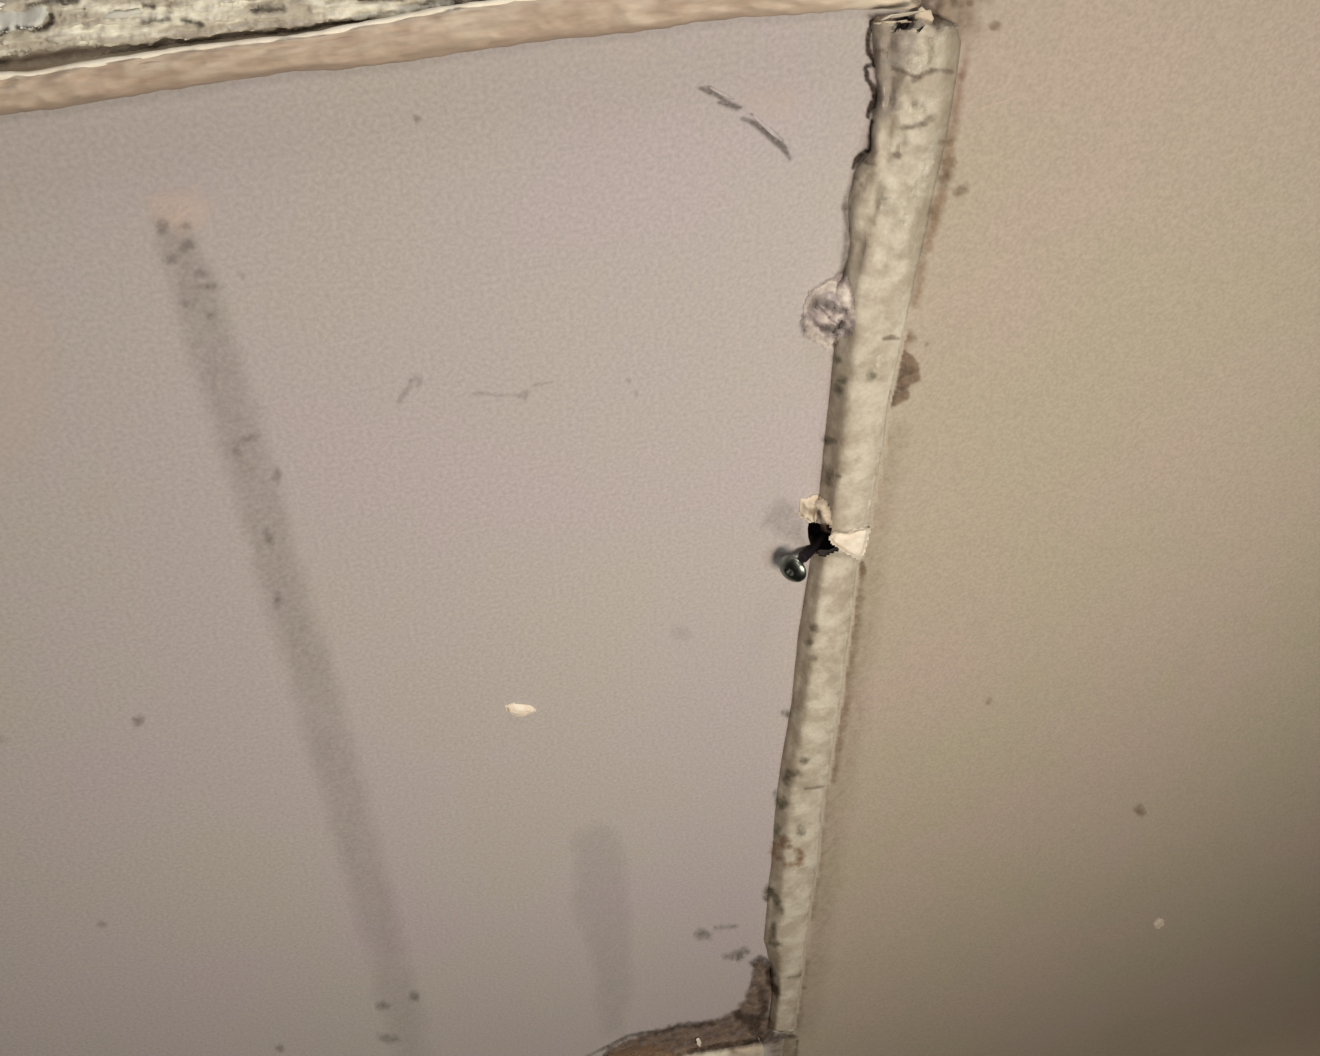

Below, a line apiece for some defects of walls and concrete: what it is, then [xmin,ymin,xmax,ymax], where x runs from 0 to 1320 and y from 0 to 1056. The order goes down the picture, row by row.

peeling [0,0,485,61]
spalling [873,6,951,75]
leakage [914,0,963,26]
crack [853,18,928,169]
crack [912,70,953,79]